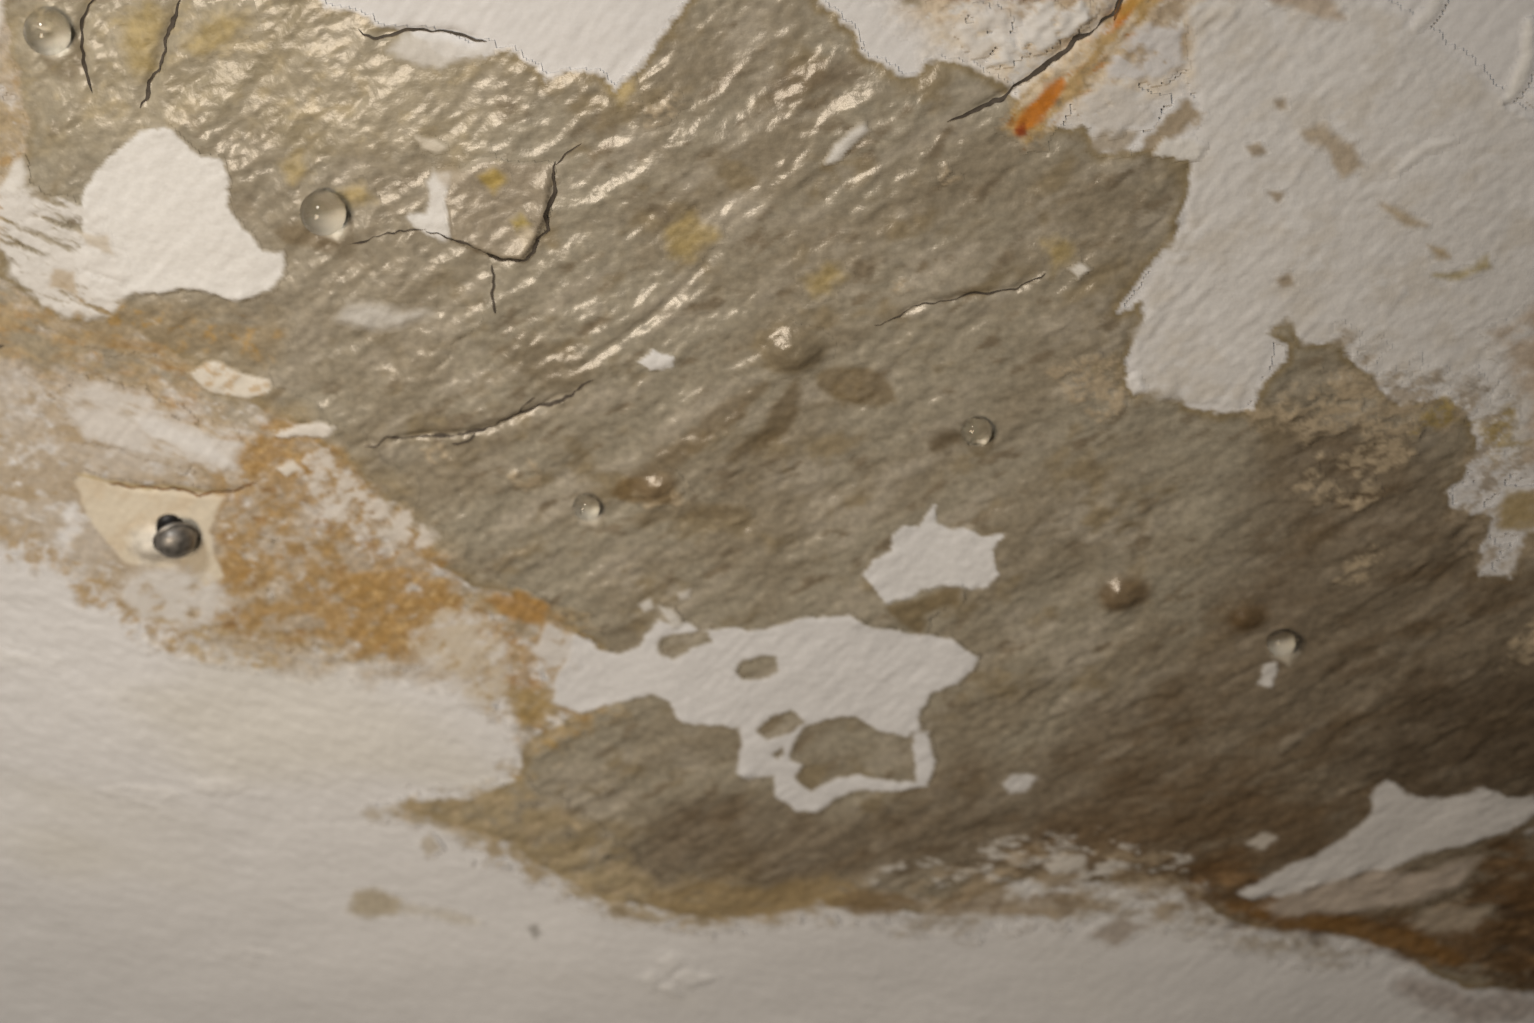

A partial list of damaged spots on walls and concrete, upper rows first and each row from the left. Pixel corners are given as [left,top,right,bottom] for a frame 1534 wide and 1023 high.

crack [358,28,487,42]
corrosion [993,0,1169,155]
peeling [0,123,288,324]
crack [352,144,580,313]
peeling [1075,0,1534,418]
peeling [51,374,252,637]
water stain [1362,351,1534,592]
peeling [403,503,1007,815]
water stain [1292,615,1534,796]
water stain [341,773,696,935]
water stain [643,866,878,940]
peeling [1233,778,1534,939]